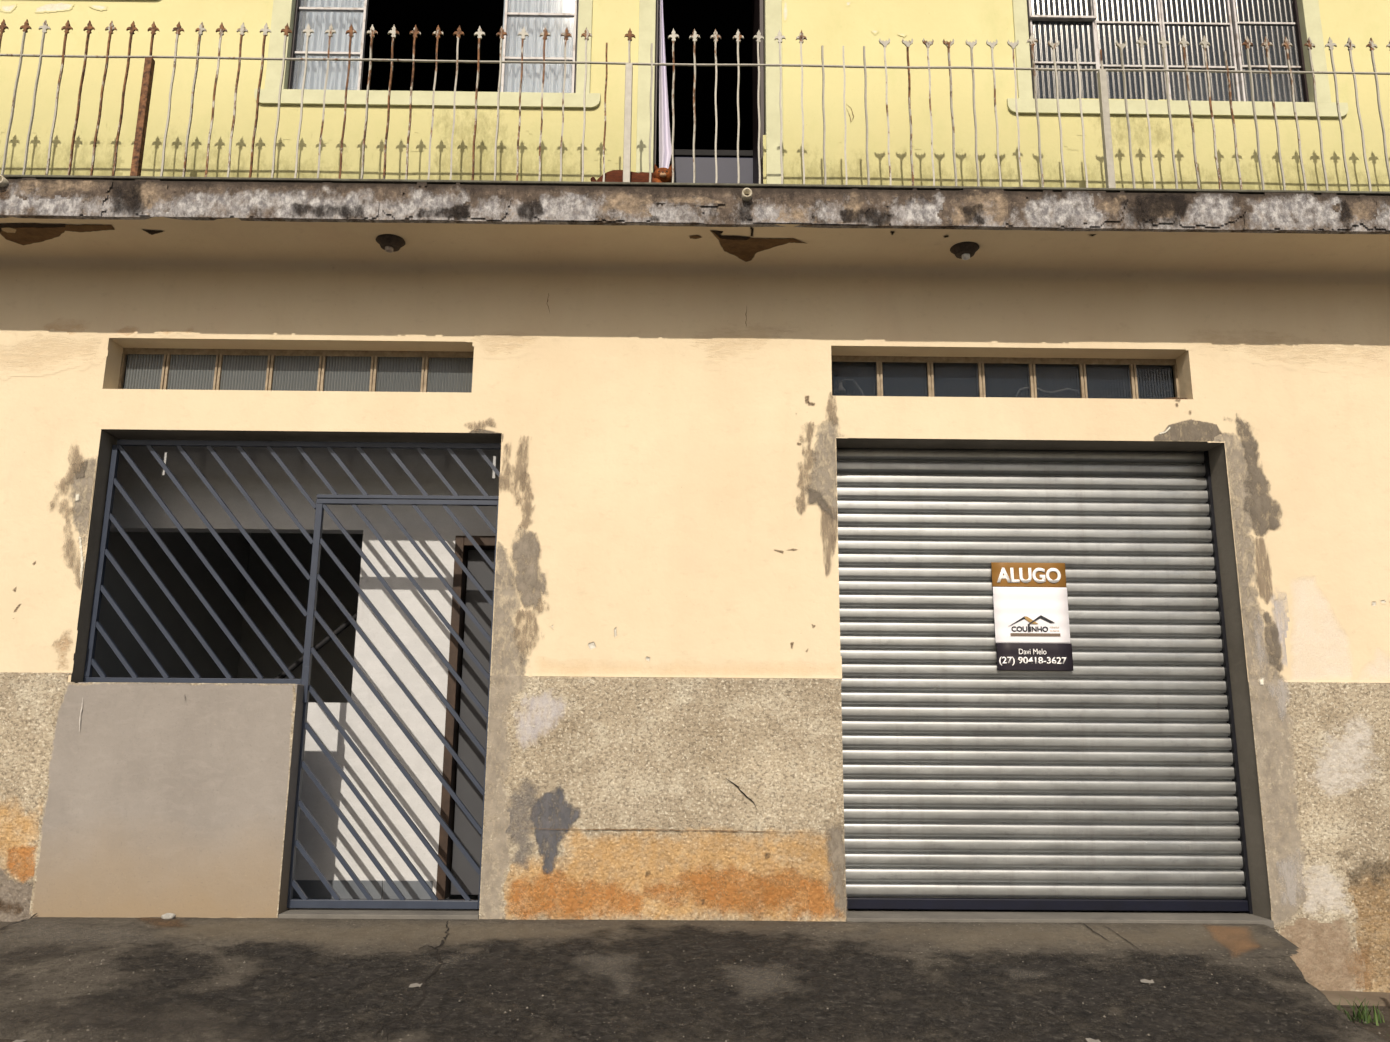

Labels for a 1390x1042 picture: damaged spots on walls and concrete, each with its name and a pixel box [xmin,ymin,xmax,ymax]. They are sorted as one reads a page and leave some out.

water stain [0,116,381,214]
water stain [410,106,619,182]
peeling [0,178,115,245]
peeling [129,179,1390,262]
spalling [1154,399,1222,442]
water stain [502,784,847,922]